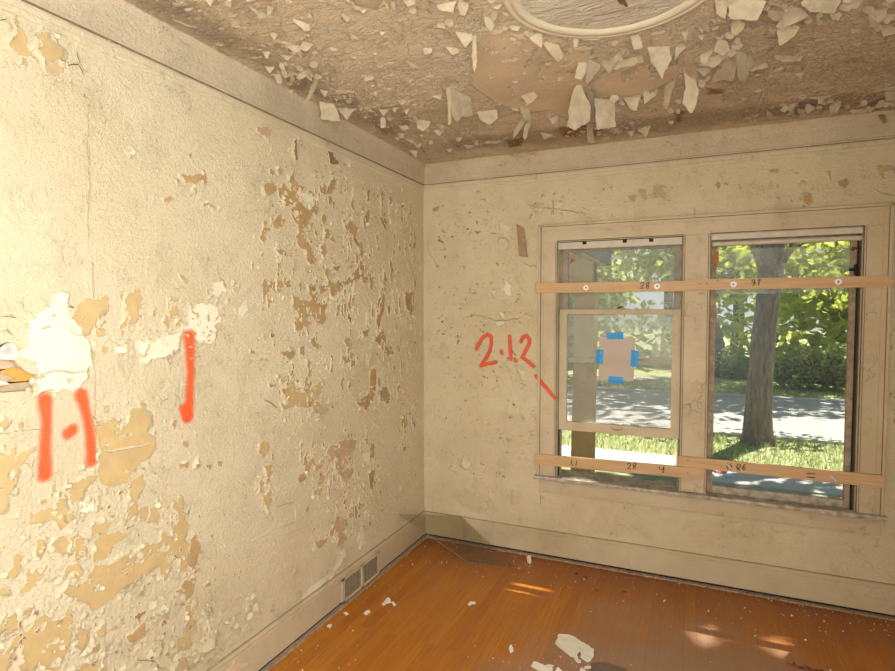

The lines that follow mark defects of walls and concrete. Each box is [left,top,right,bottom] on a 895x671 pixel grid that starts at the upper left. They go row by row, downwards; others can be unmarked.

peeling [156,0,895,159]
peeling [0,124,590,602]
peeling [0,399,274,671]